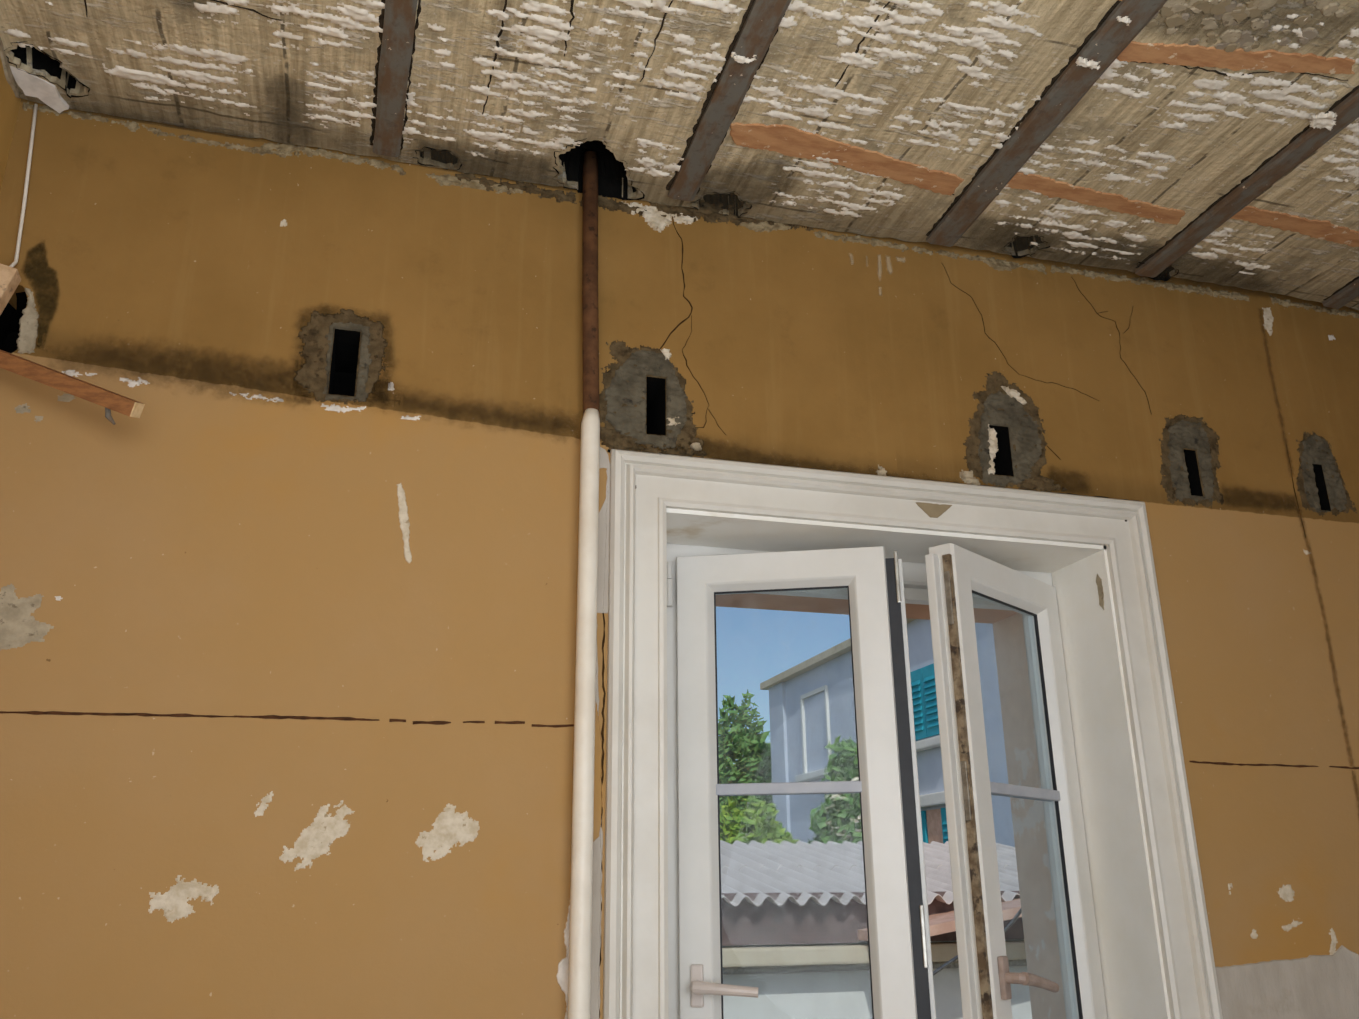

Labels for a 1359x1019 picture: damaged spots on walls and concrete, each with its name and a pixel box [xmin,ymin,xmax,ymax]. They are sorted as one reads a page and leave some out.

leakage [24,243,58,347]
crack [659,217,726,435]
crack [942,264,1099,401]
crack [1071,276,1152,415]
peeling [397,483,412,564]
peeling [0,583,63,651]
peeling [254,791,274,817]
peeling [279,800,355,871]
peeling [415,803,480,862]
peeling [148,875,219,923]
peeling [1278,884,1295,902]
peeling [1215,928,1359,1019]